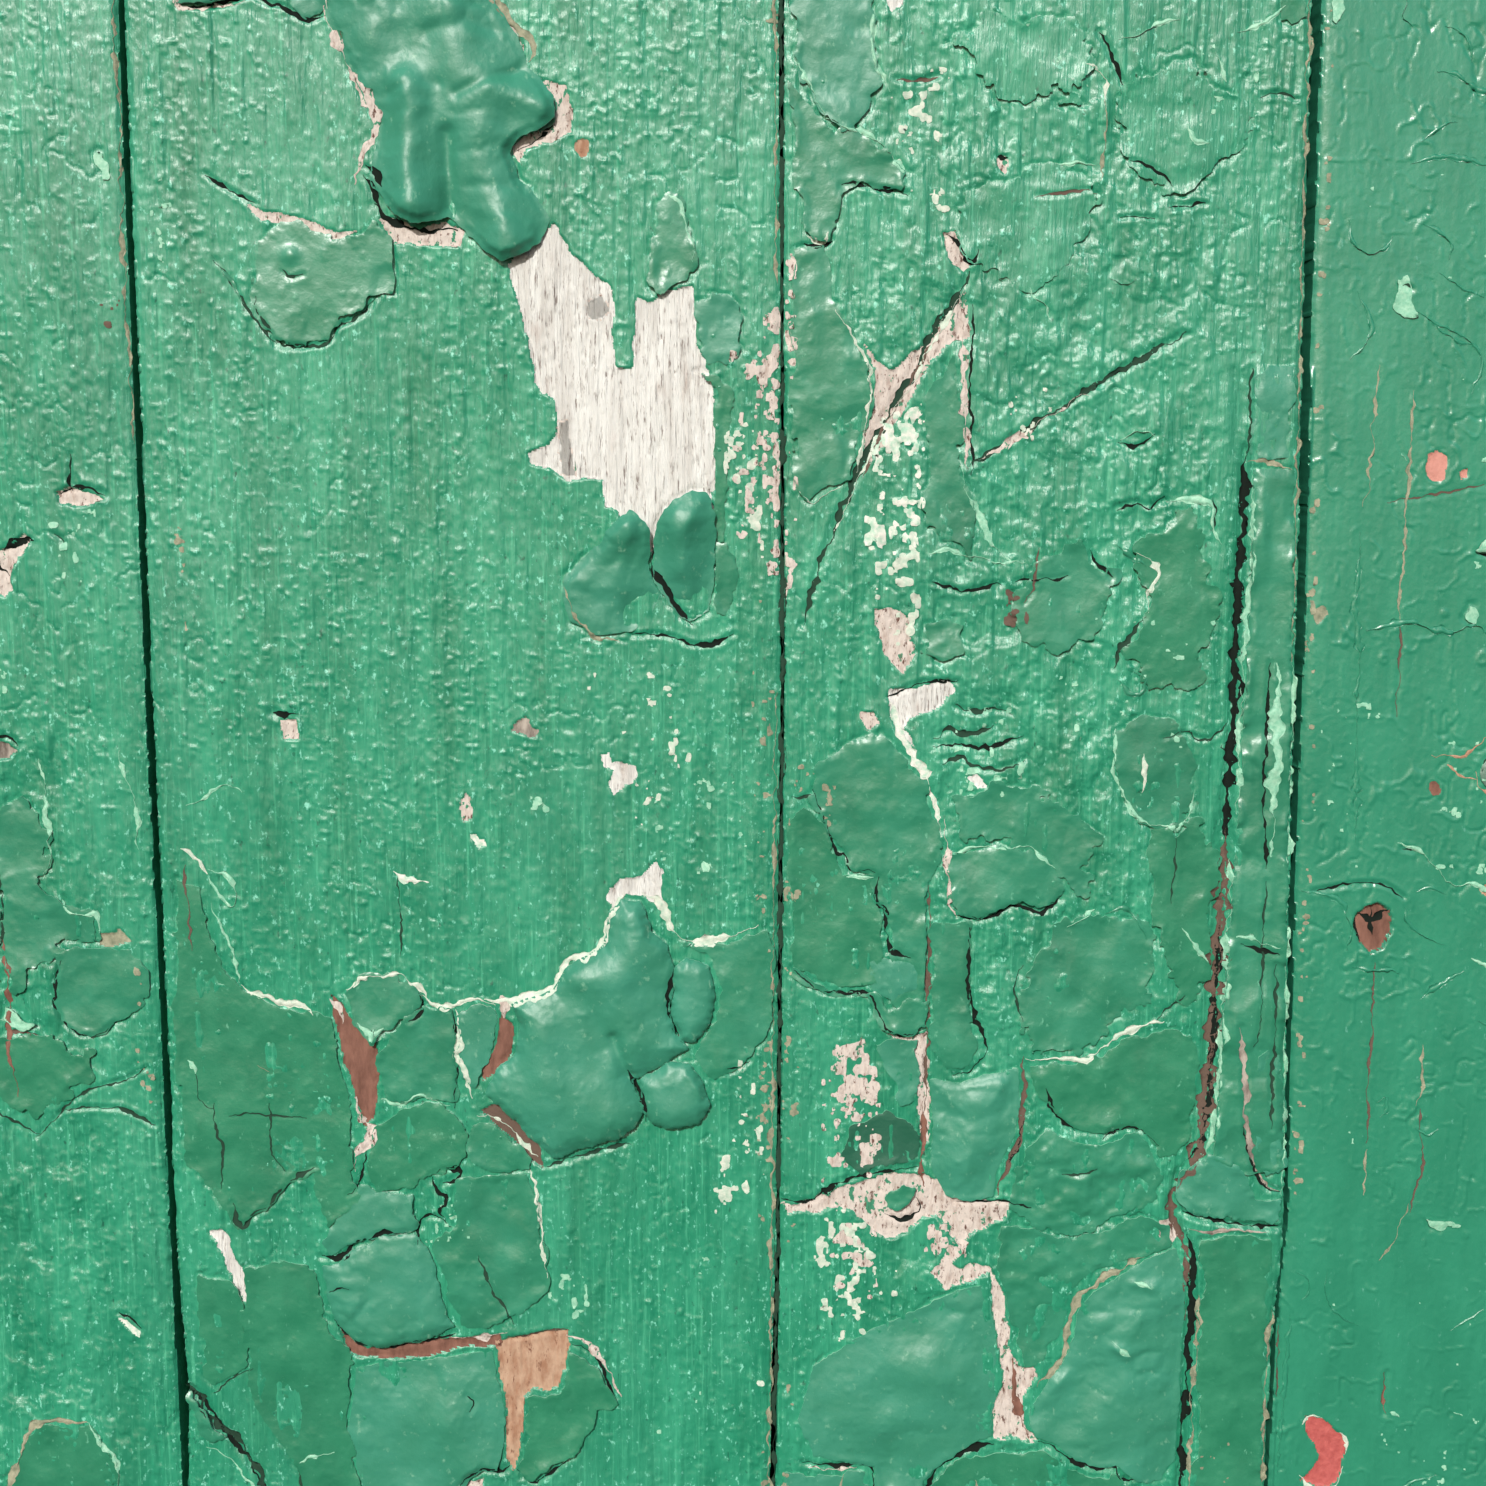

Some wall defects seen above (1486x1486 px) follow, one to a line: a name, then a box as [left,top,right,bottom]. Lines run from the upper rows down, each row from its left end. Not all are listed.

crack [0,534,64,576]
crack [186,1369,302,1486]
crack [322,1165,463,1349]
peeling [171,880,618,1486]
peeling [508,191,743,615]
peeling [787,0,976,560]
crack [781,789,1061,1222]
crack [887,679,1025,772]
peeling [683,607,1288,1486]
peeling [943,157,1102,294]
peeling [953,10,1096,106]
crack [926,368,1281,1486]